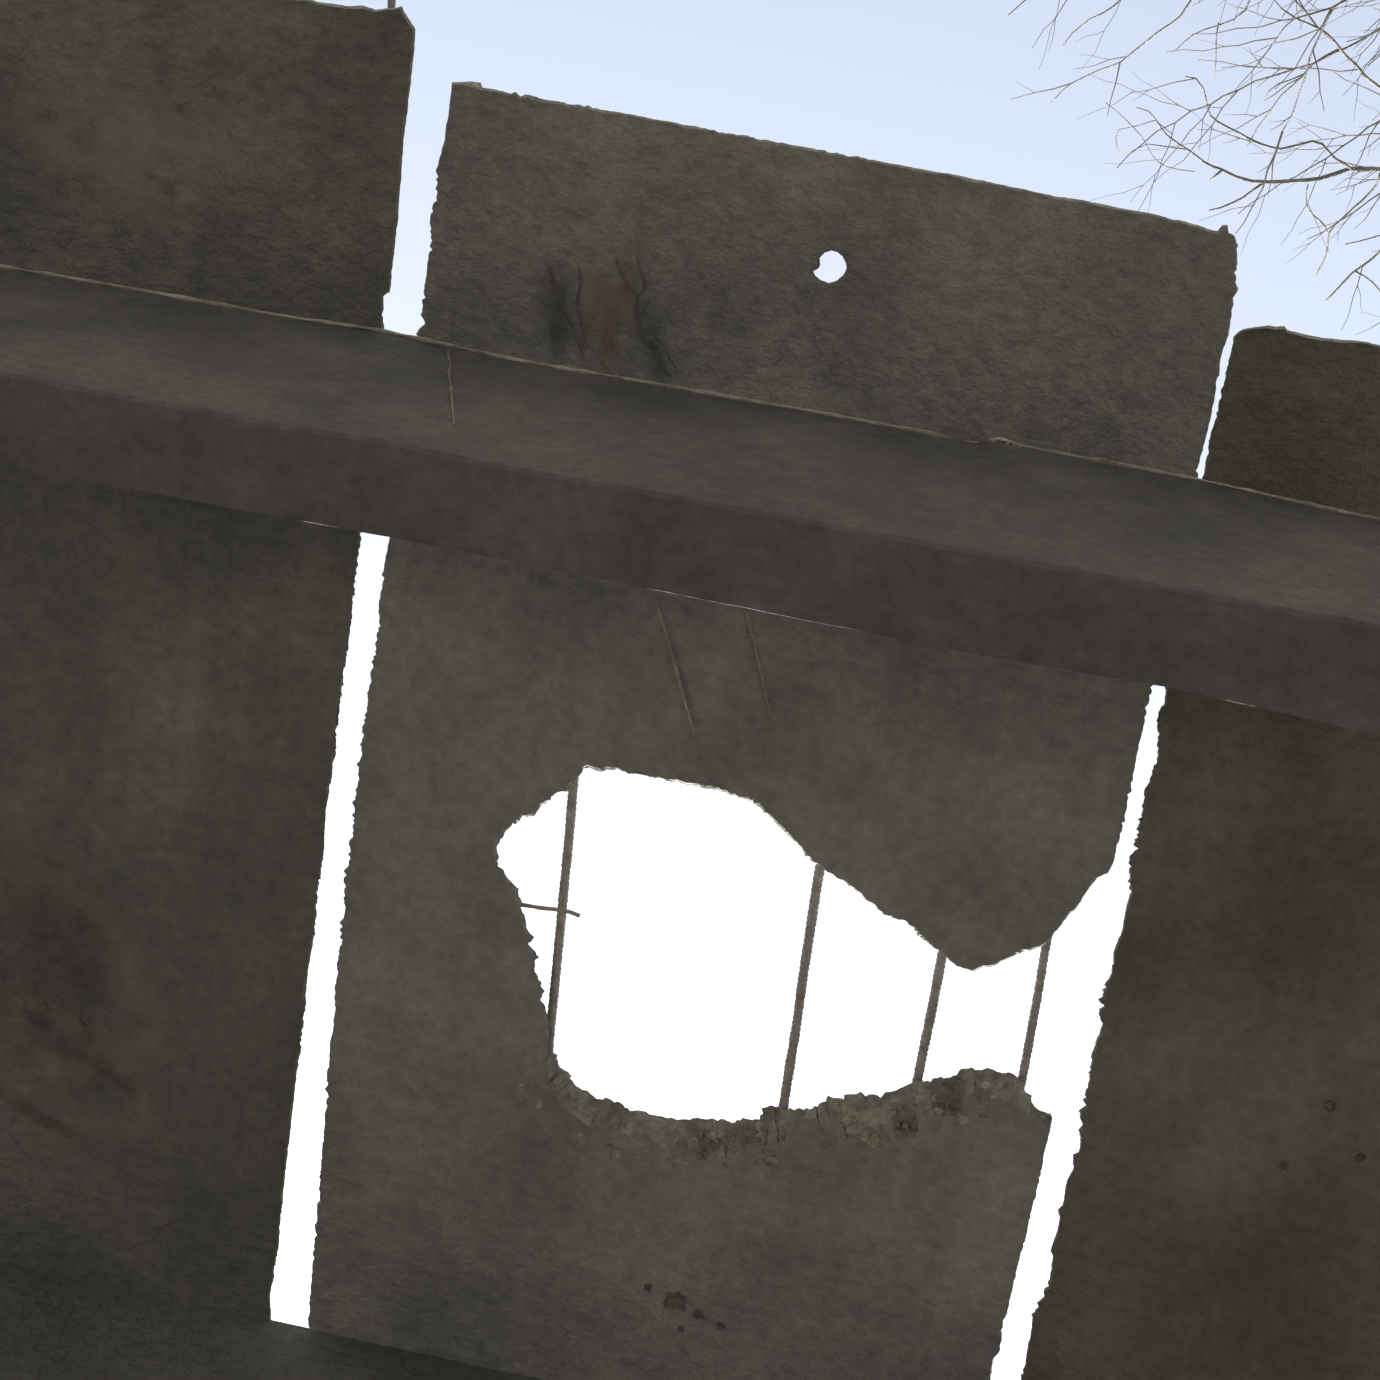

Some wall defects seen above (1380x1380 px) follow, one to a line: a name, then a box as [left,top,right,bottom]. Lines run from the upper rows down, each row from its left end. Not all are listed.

spalling [547,776,579,1052]
spalling [573,864,825,1168]
spalling [826,937,1052,1148]